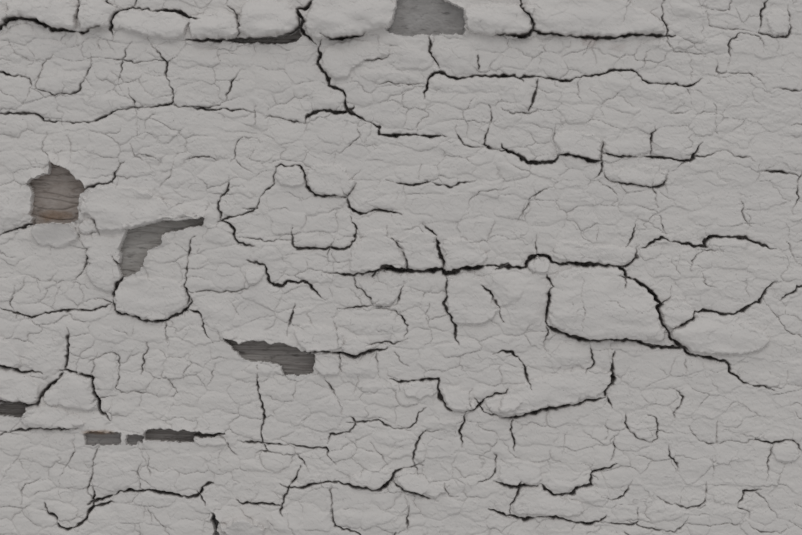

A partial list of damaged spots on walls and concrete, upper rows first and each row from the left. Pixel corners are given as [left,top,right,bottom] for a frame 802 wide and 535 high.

peeling [384,0,468,38]
crack [0,0,447,154]
peeling [25,157,88,228]
crack [85,137,219,191]
crack [0,217,255,352]
peeling [116,215,206,279]
crack [217,0,802,535]
crack [0,327,151,422]
peeling [221,337,318,379]
peeling [0,403,28,422]
peeling [81,425,227,448]
crack [0,427,214,535]